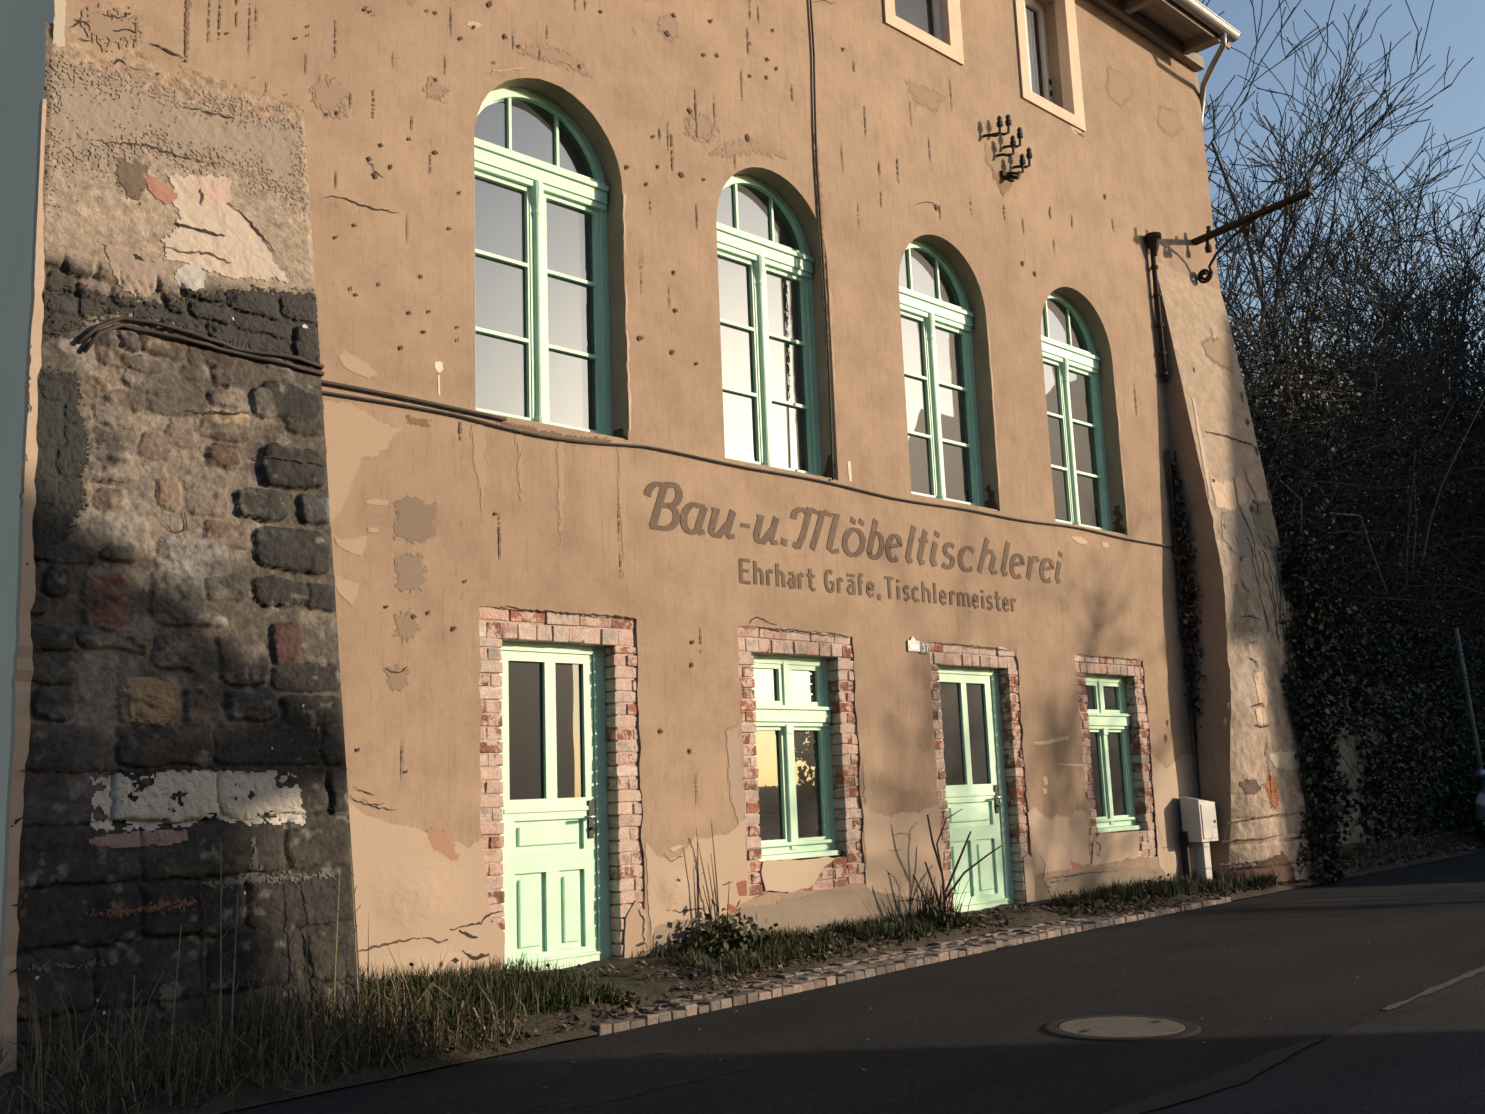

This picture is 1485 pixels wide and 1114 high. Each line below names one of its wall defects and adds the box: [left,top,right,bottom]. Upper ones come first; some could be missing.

spalling [104,170,288,298]
crack [329,160,399,213]
peeling [89,766,307,848]
peeling [349,804,505,976]
crack [358,911,503,960]
peeling [623,819,842,958]
peeling [862,804,943,919]
peeling [1022,752,1197,903]